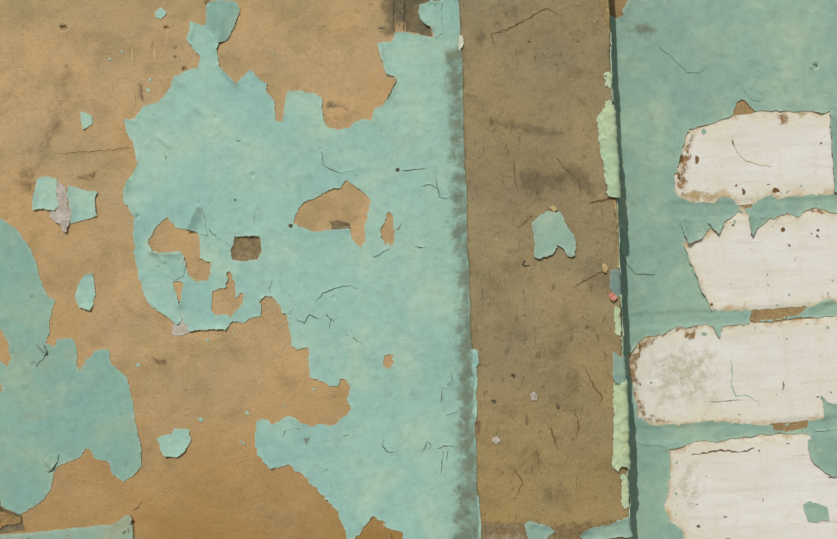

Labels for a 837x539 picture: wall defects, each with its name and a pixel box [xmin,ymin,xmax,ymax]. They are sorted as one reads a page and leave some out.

peeling [80,111,93,130]
crack [732,140,772,167]
peeling [32,176,98,232]
crack [396,165,449,199]
peeling [532,205,576,259]
peeling [123,0,566,539]
peeling [578,0,837,539]
crack [283,281,361,345]
peeling [0,219,142,533]
crack [423,441,455,471]
crack [691,448,754,456]